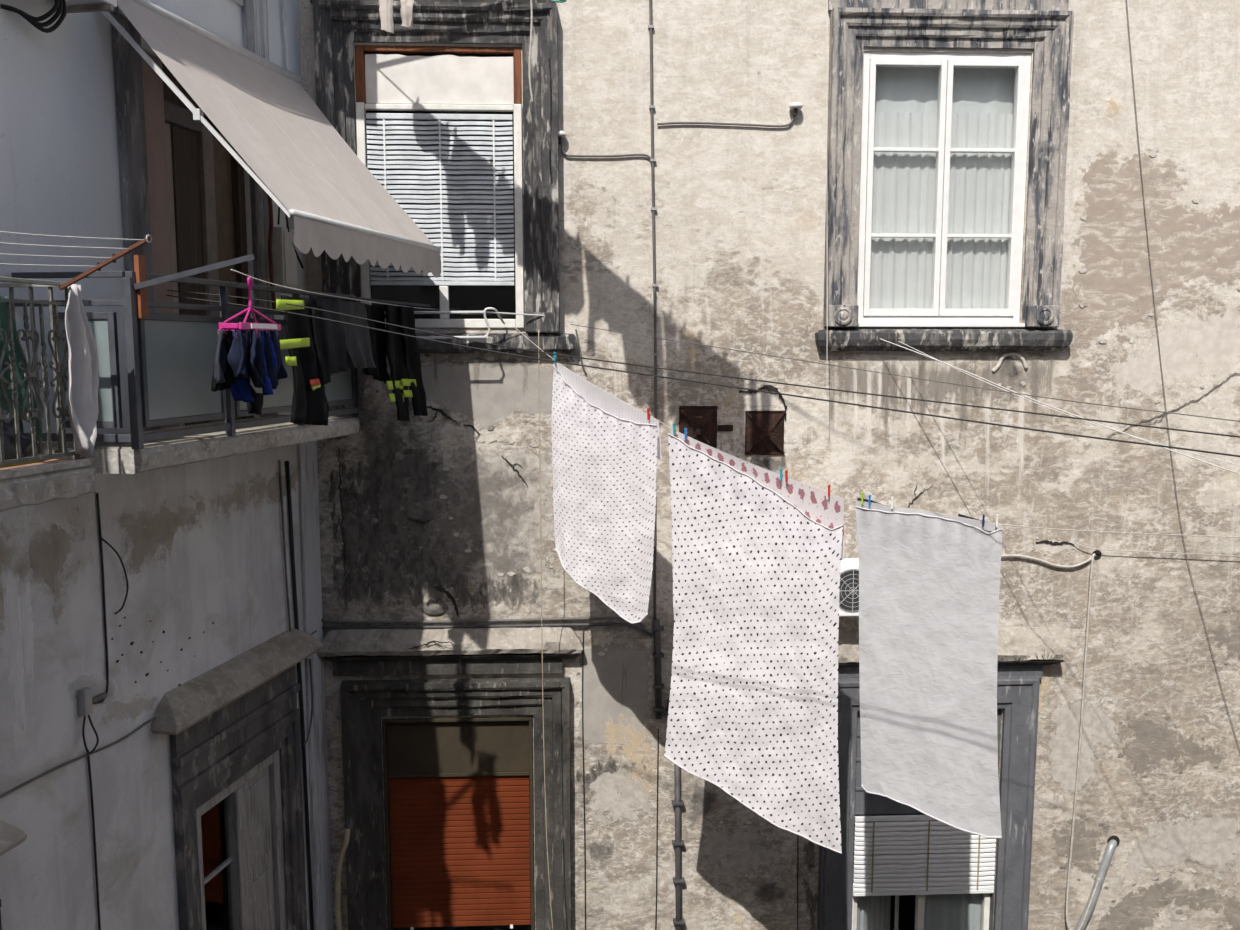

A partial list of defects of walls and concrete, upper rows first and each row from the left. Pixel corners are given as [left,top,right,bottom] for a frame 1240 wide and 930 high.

flaking render [1072,151,1240,403]
flaking render [408,362,556,576]
water stain [830,358,1053,462]
crack [1108,372,1240,437]